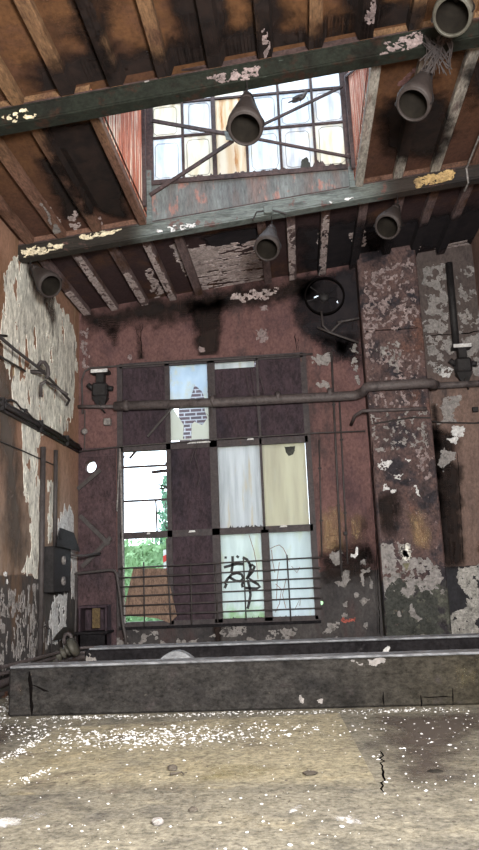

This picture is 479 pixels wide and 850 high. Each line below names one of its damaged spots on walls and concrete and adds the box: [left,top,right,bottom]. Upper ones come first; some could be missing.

water stain [28,0,427,96]
peeling [207,28,271,83]
peeling [40,203,122,240]
peeling [413,170,455,189]
peeling [75,256,117,311]
water stain [81,206,479,356]
water stain [316,336,362,364]
peeling [350,258,479,385]
peeling [0,243,91,672]
peeling [370,390,465,493]
peeling [323,542,479,638]
crack [378,751,386,792]